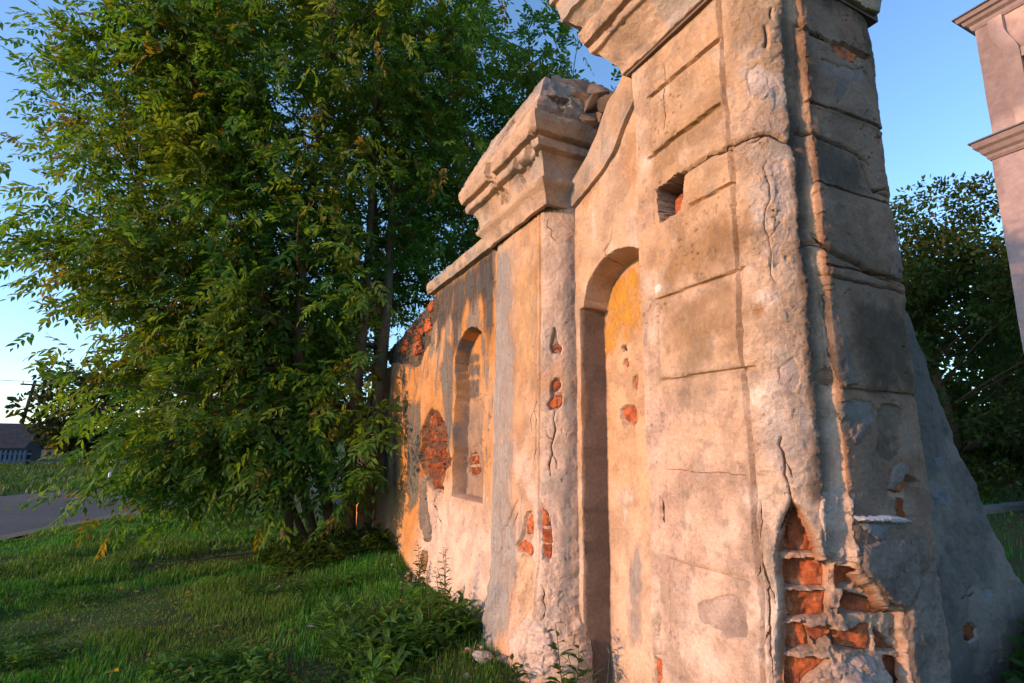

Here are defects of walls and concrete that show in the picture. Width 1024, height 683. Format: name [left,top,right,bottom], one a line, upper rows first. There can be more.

hole [665,192,684,220]
crack [689,133,866,284]
spalling [388,298,440,367]
spalling [551,330,562,354]
spalling [423,410,452,492]
spalling [470,453,481,475]
crack [530,391,557,474]
spalling [549,379,562,410]
spalling [624,406,638,425]
peeling [516,504,553,621]
crack [757,438,793,682]
spalling [780,507,898,683]